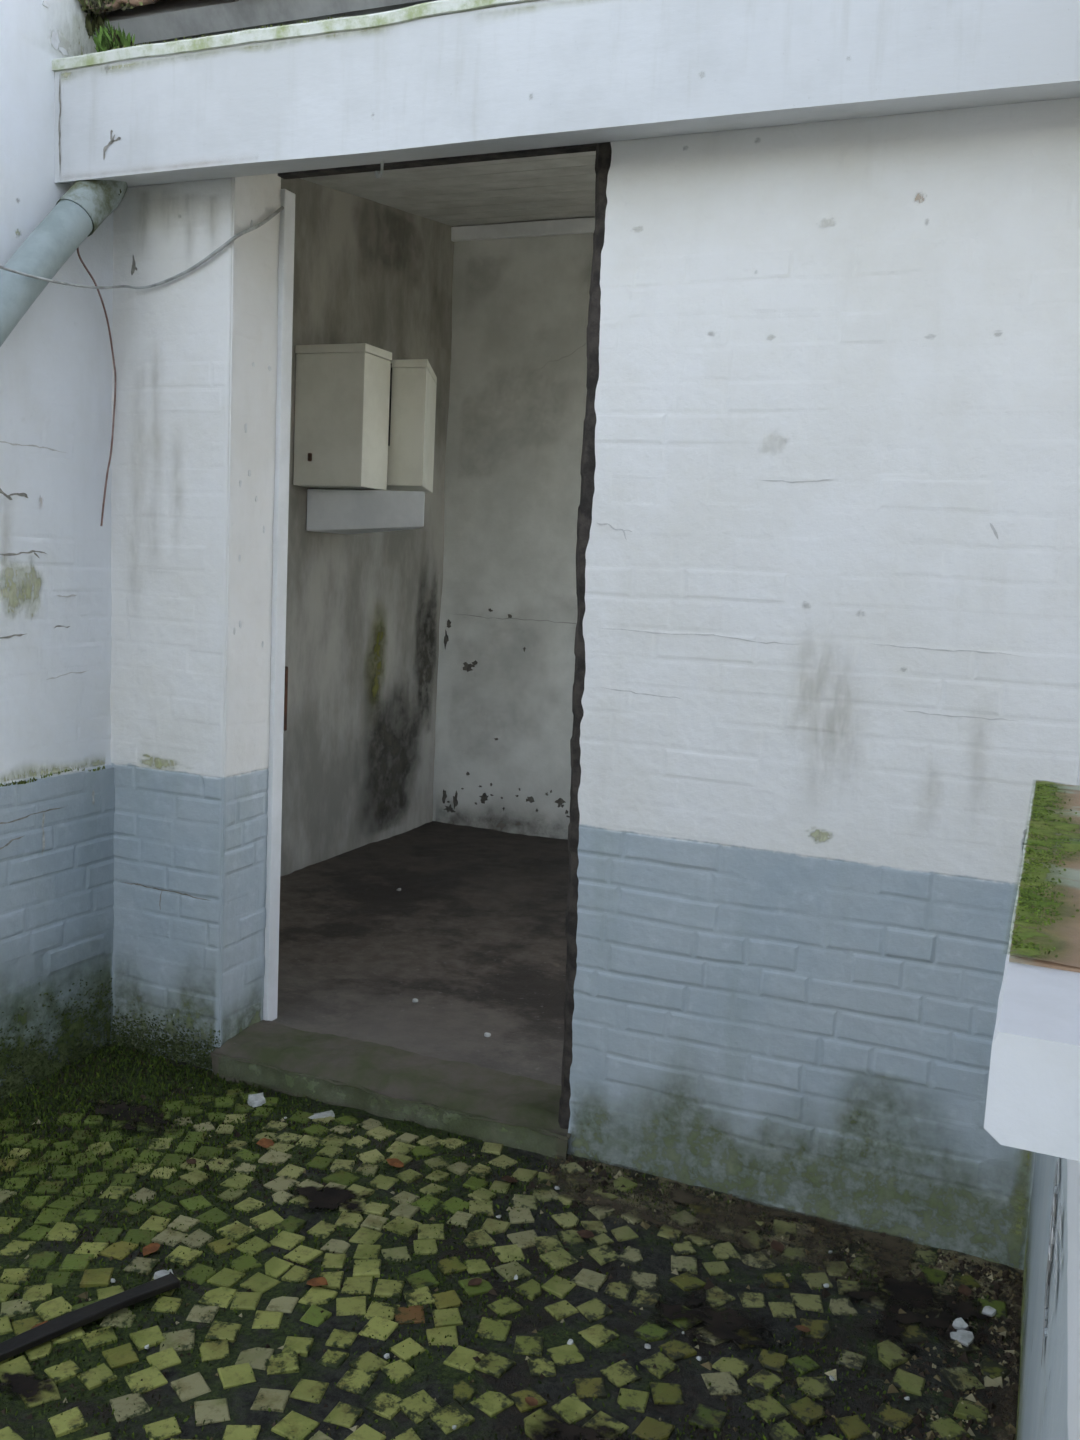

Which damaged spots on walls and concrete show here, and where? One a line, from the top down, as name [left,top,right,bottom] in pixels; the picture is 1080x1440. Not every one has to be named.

damp [368,584,436,829]
flaking render [1041,1157,1062,1364]